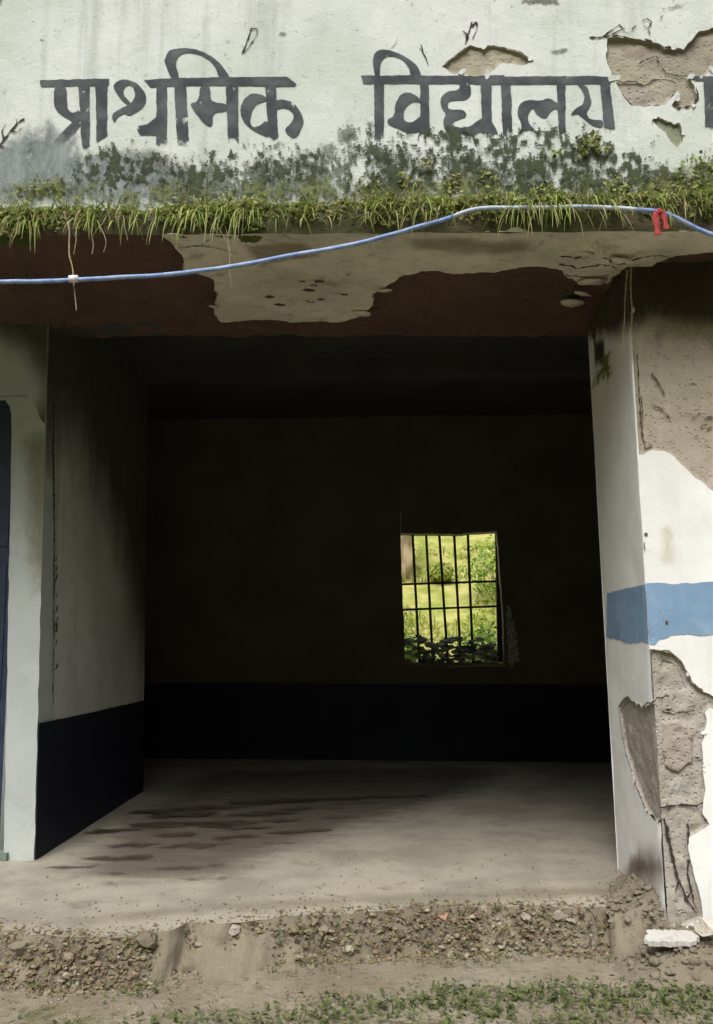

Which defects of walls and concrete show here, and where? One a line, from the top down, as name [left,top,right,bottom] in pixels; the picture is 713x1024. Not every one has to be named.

damp [338,124,355,178]
peeling [442,44,533,79]
damp [572,124,604,159]
peeling [606,28,713,147]
spalling [0,234,713,338]
peeling [632,315,713,491]
spalling [618,649,713,927]
crack [659,802,703,913]